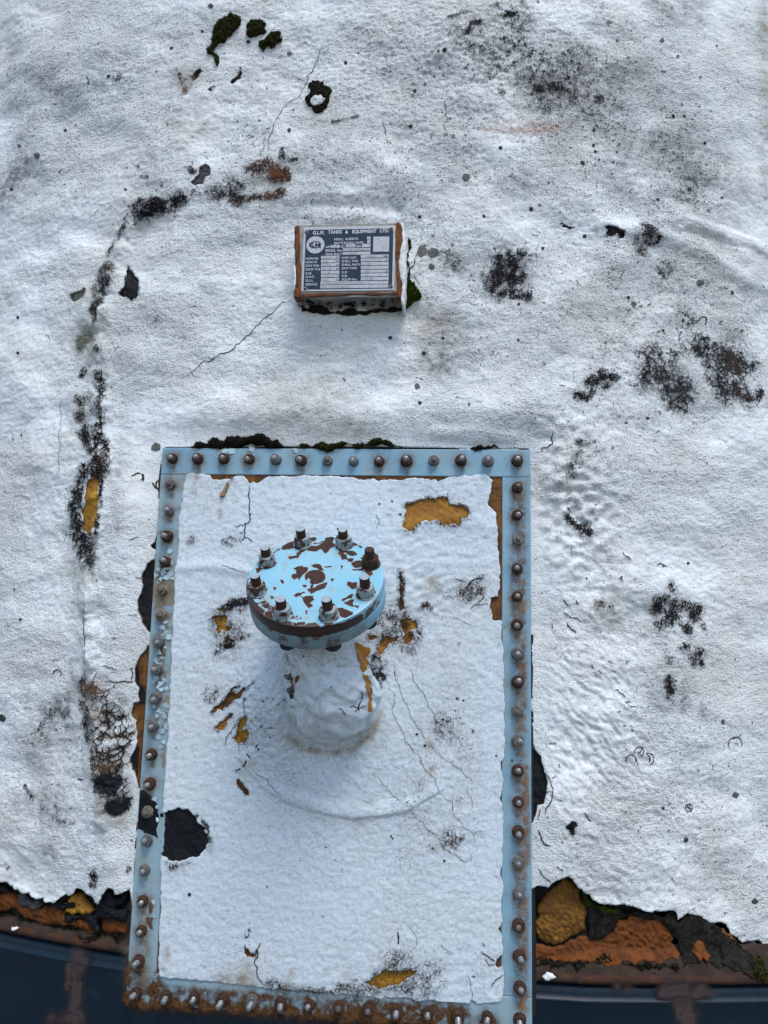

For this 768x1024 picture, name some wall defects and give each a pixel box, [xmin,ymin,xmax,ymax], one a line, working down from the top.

crack [46,45,323,572]
peeling [401,494,471,533]
peeling [210,684,272,745]
peeling [261,673,300,708]
peeling [96,774,208,861]
rust [513,745,530,917]
rust [123,962,498,1024]
peeling [365,966,419,993]